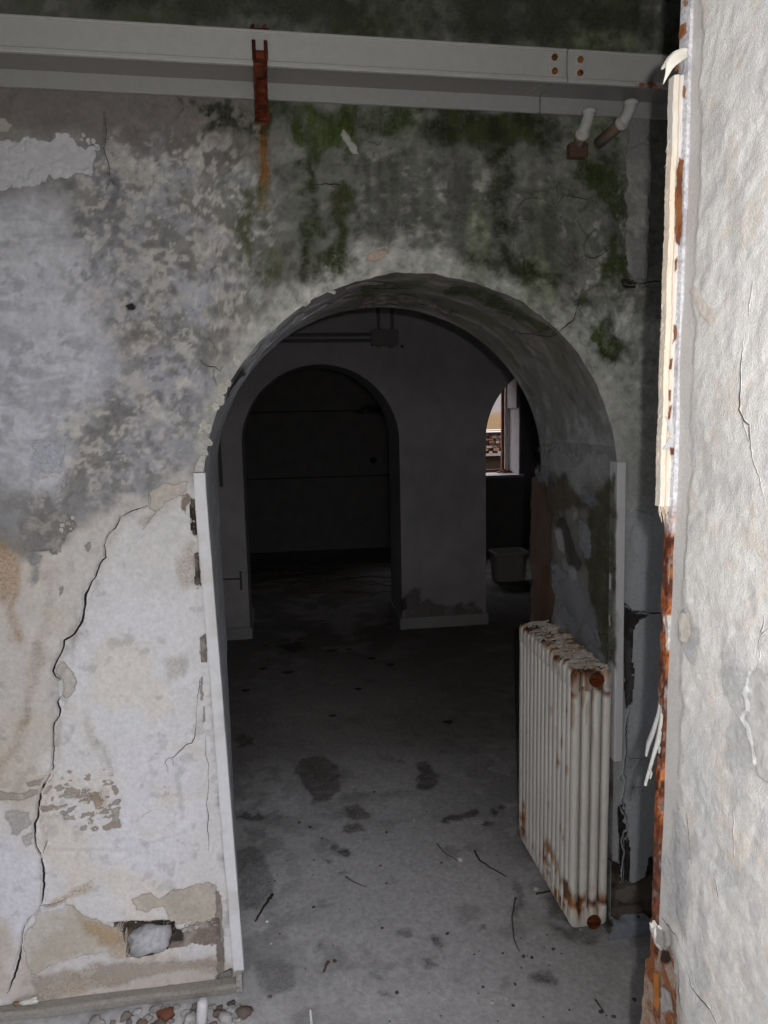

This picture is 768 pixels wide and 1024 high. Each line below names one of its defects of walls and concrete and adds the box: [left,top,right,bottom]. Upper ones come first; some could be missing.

peeling [0,118,100,191]
damp [299,163,417,280]
crack [737,281,766,506]
peeling [529,467,601,650]
spalling [624,603,648,708]
crack [5,490,182,994]
peeling [0,769,121,846]
peeling [23,882,233,979]
rust [640,946,678,1024]